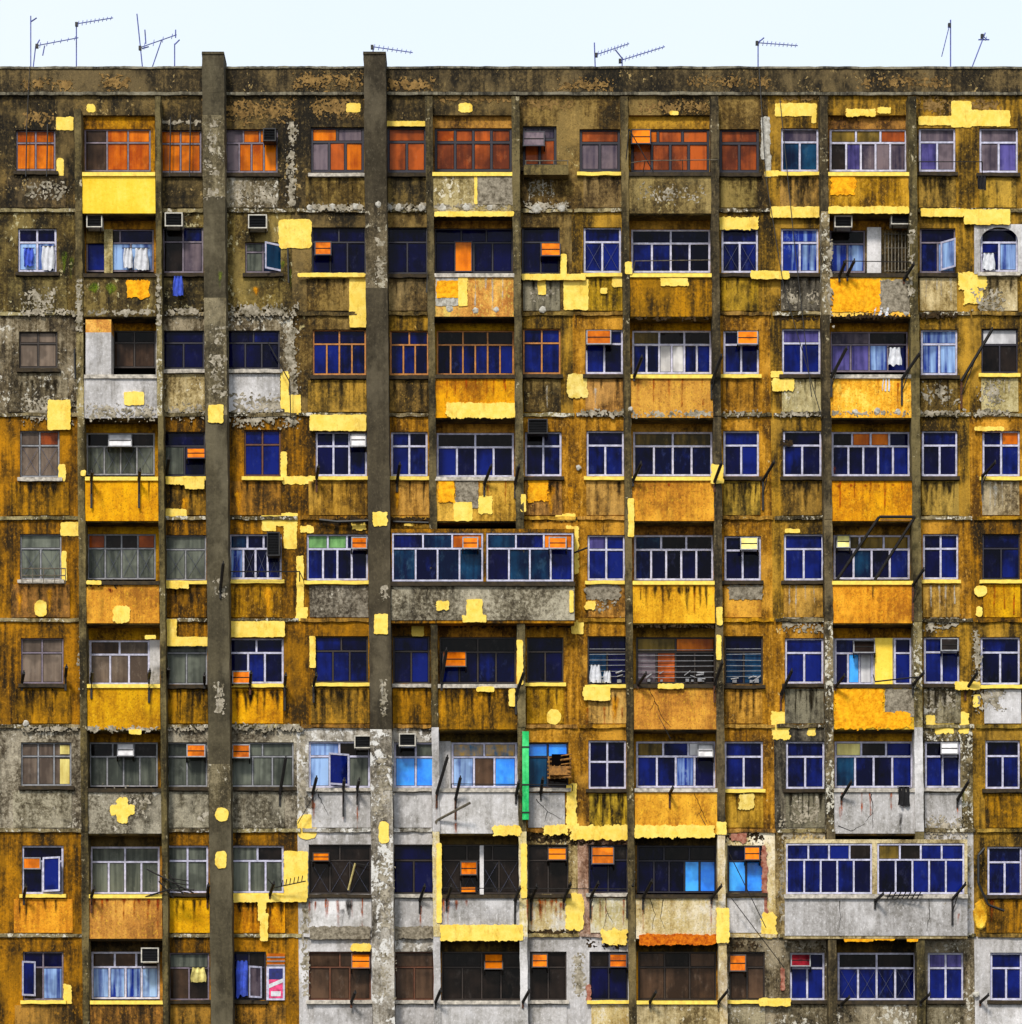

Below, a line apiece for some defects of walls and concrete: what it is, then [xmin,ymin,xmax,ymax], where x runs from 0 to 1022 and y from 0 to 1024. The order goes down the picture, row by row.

spalling [162,71,364,207]
peeling [22,178,71,201]
peeling [311,201,365,212]
peeling [387,176,569,213]
peeling [638,182,706,206]
damp [726,482,757,499]
peeling [584,584,622,618]
damp [16,688,57,712]
peeling [300,852,624,1001]